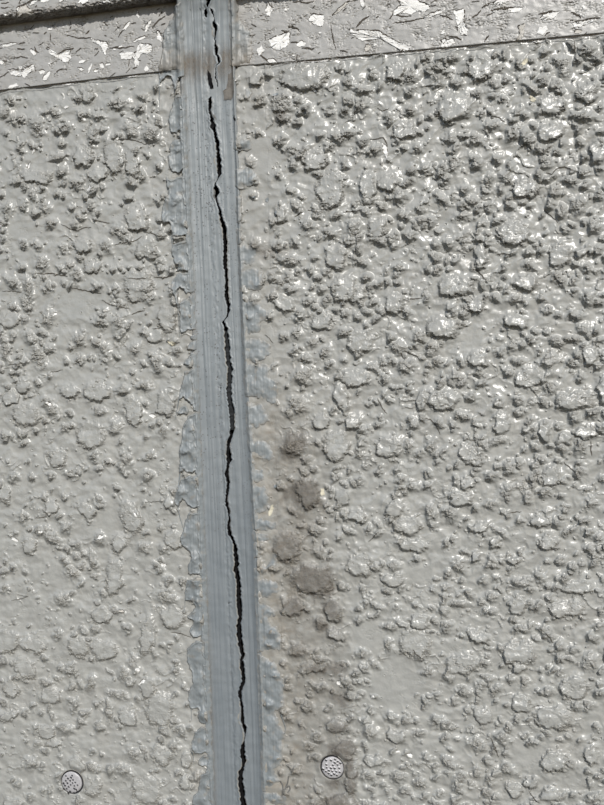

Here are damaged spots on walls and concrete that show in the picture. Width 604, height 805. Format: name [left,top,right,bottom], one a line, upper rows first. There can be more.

peeling [0,0,165,89]
peeling [249,0,350,64]
peeling [349,0,411,55]
peeling [389,0,523,48]
peeling [532,10,559,43]
peeling [570,5,601,35]
crack [206,0,247,805]